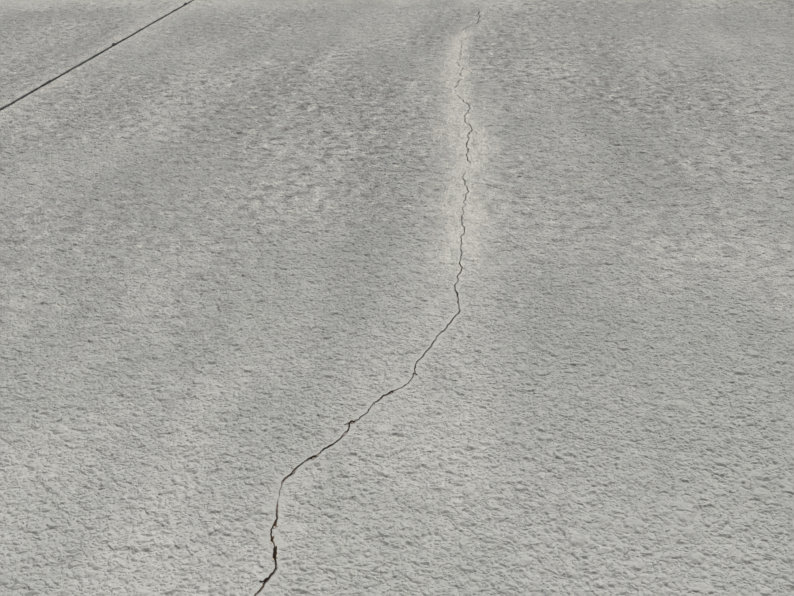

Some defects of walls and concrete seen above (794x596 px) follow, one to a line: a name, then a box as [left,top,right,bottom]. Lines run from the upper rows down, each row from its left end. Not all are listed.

crack [254,11,481,596]